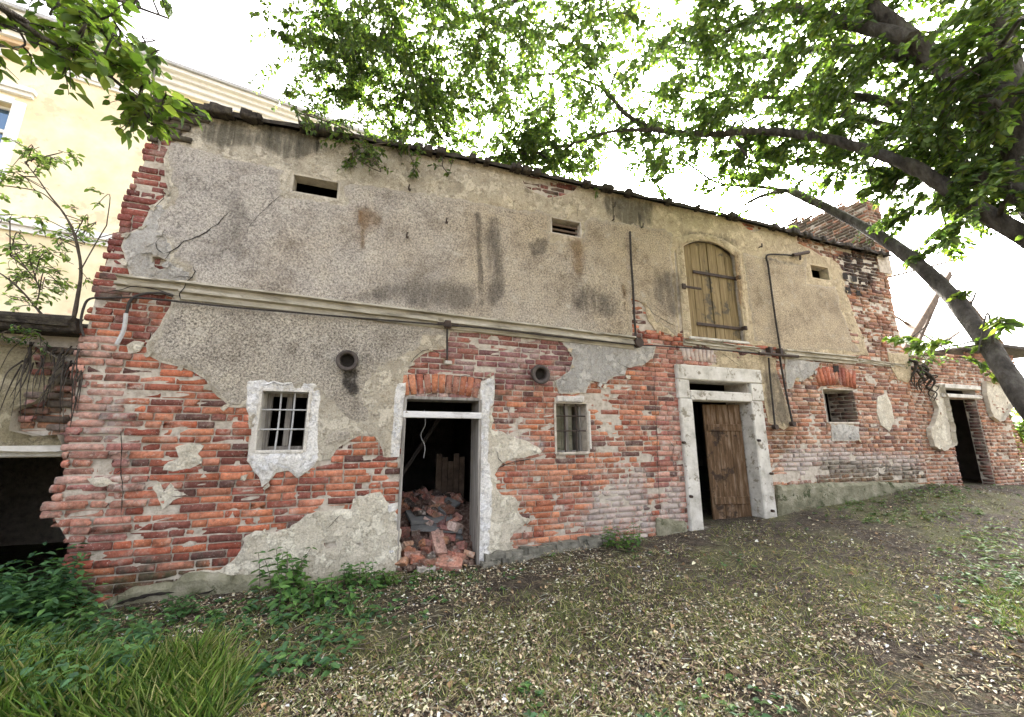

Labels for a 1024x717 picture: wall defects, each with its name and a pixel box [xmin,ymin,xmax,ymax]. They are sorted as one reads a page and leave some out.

crack [108,193,287,299]
spalling [20,114,402,608]
spalling [408,237,1024,554]